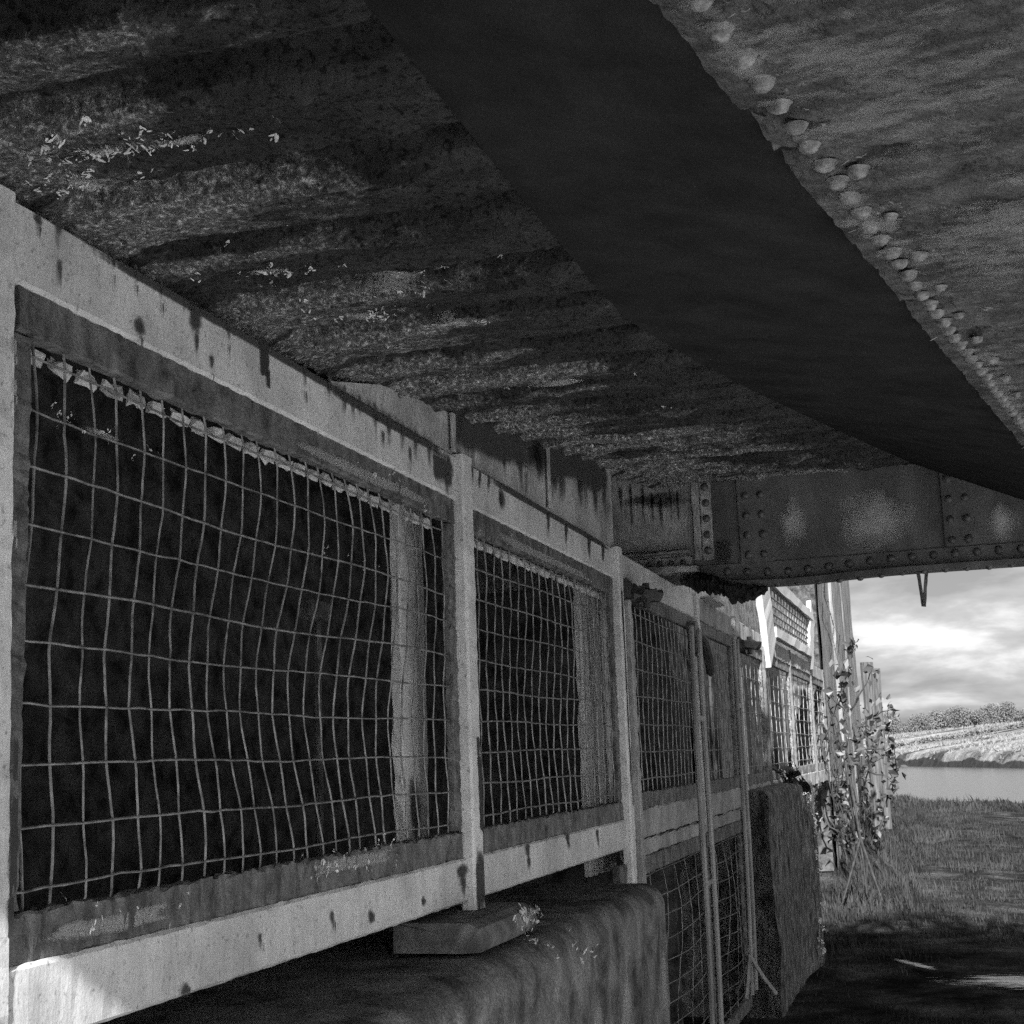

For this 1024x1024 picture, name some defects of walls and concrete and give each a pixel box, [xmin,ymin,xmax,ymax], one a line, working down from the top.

damp [96,250,411,431]